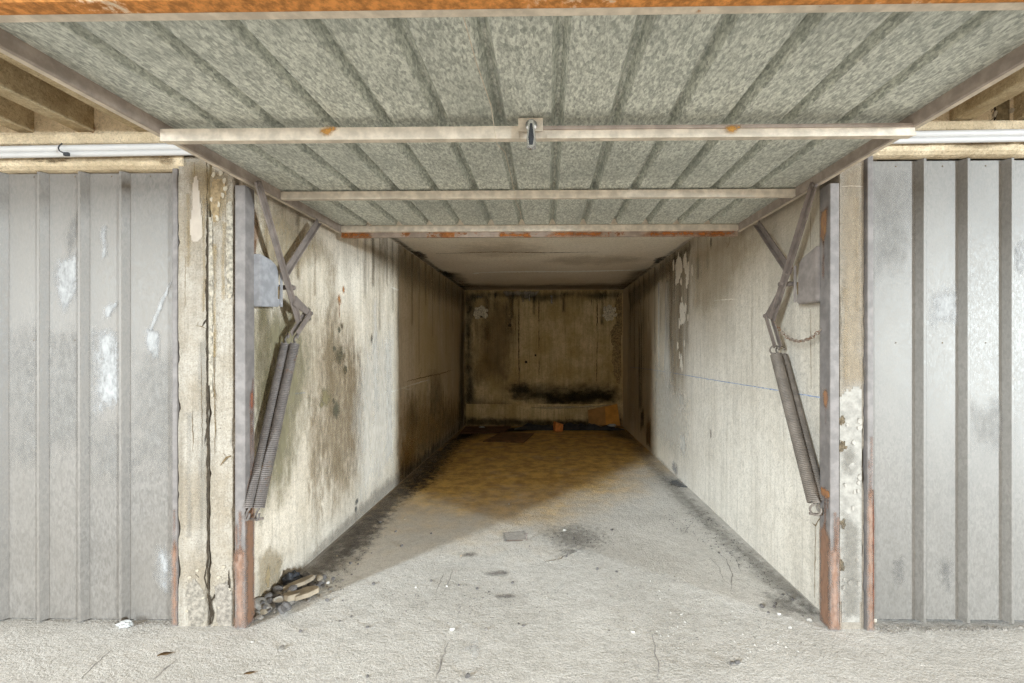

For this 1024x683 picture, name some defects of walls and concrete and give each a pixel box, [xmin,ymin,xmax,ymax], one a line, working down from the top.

peeling [673,252,693,328]
crack [185,162,232,624]
damp [305,238,690,566]
corrosion [234,508,255,626]
corrosion [820,487,840,630]